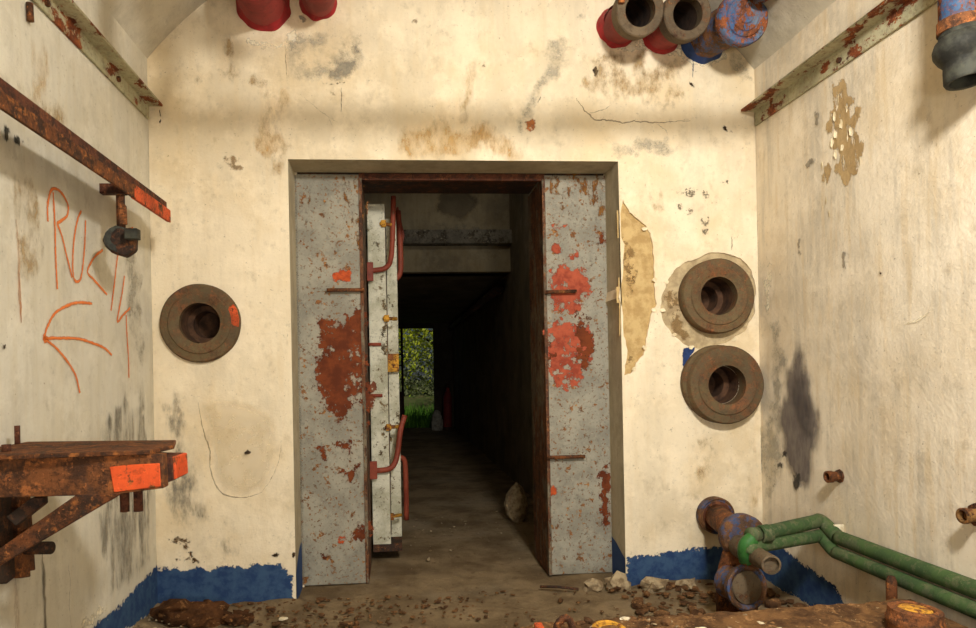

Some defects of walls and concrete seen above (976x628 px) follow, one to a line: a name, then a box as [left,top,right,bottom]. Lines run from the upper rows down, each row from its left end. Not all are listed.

crack [576,98,677,127]
peeling [805,79,864,186]
flaking render [616,203,755,375]
water stain [761,378,781,468]
water stain [101,492,145,581]